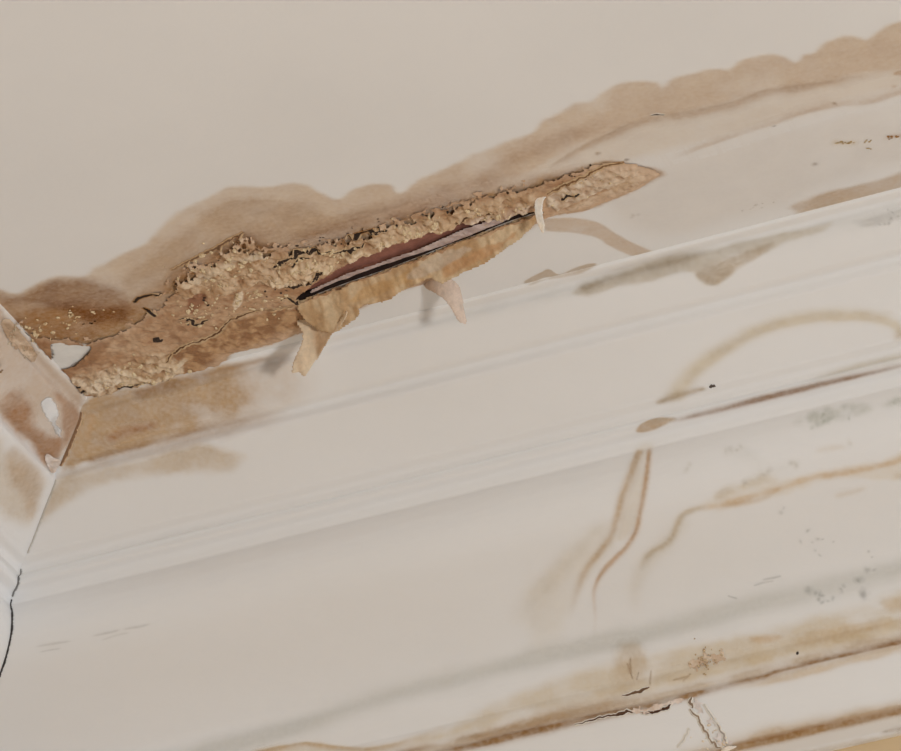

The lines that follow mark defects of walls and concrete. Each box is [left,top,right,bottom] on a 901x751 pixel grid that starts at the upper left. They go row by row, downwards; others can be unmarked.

spalling [1,161,660,397]
peeling [41,398,61,437]
crack [0,412,83,678]